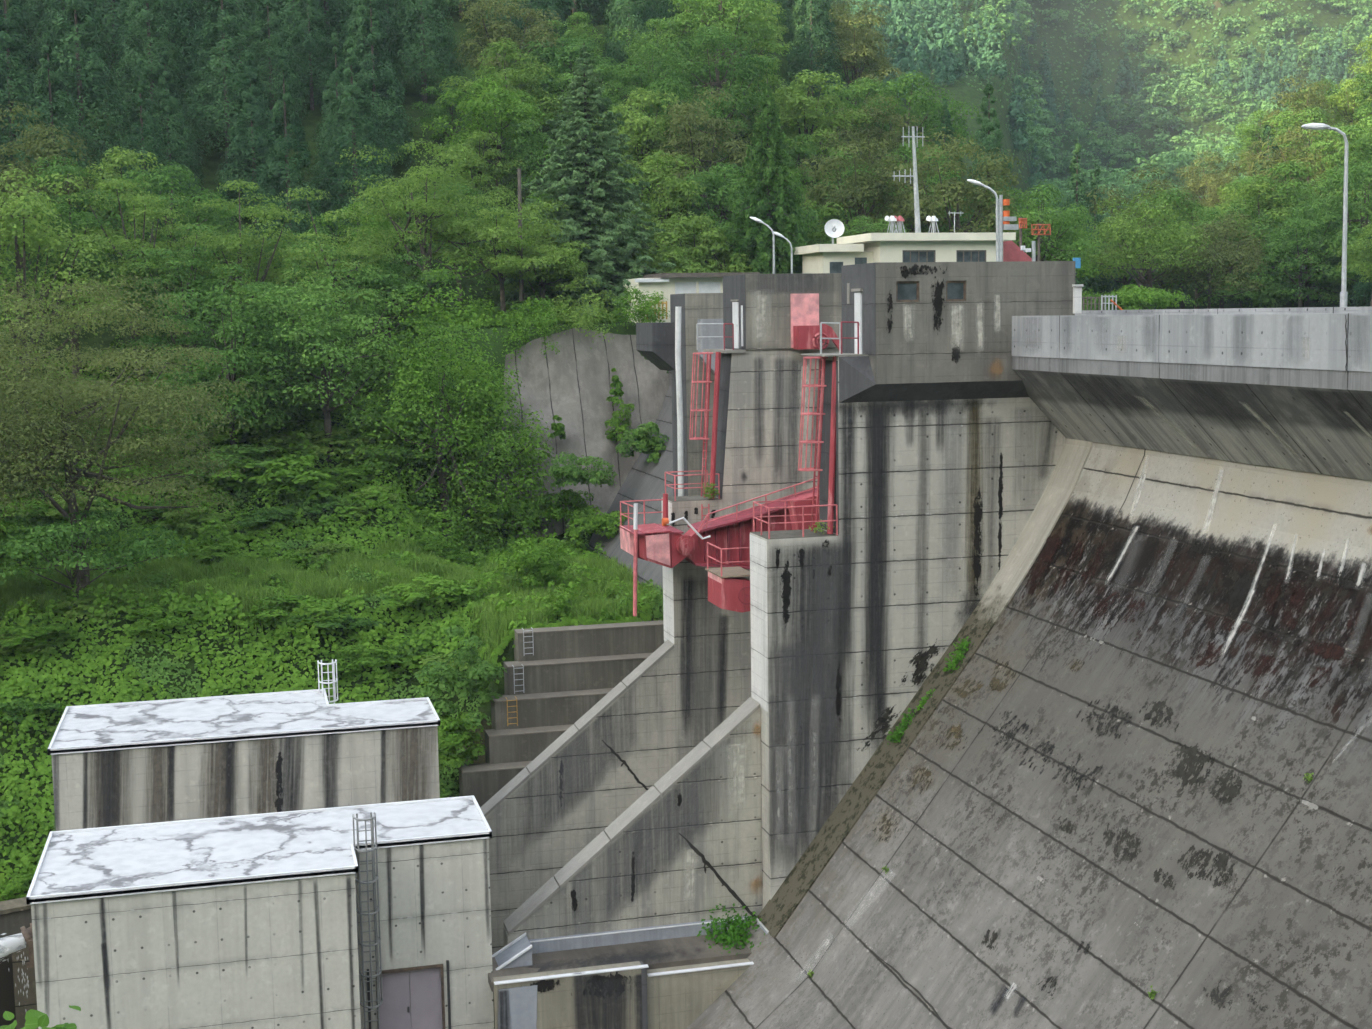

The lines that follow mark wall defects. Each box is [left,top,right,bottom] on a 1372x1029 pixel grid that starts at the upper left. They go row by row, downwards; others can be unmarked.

water stain [771,399,1004,853]
water stain [83,750,124,829]
water stain [149,746,174,823]
water stain [207,741,234,818]
water stain [257,736,301,814]
water stain [323,734,337,808]
water stain [381,728,430,803]
crack [602,740,648,790]
crack [678,833,756,919]
water stain [574,952,671,1029]